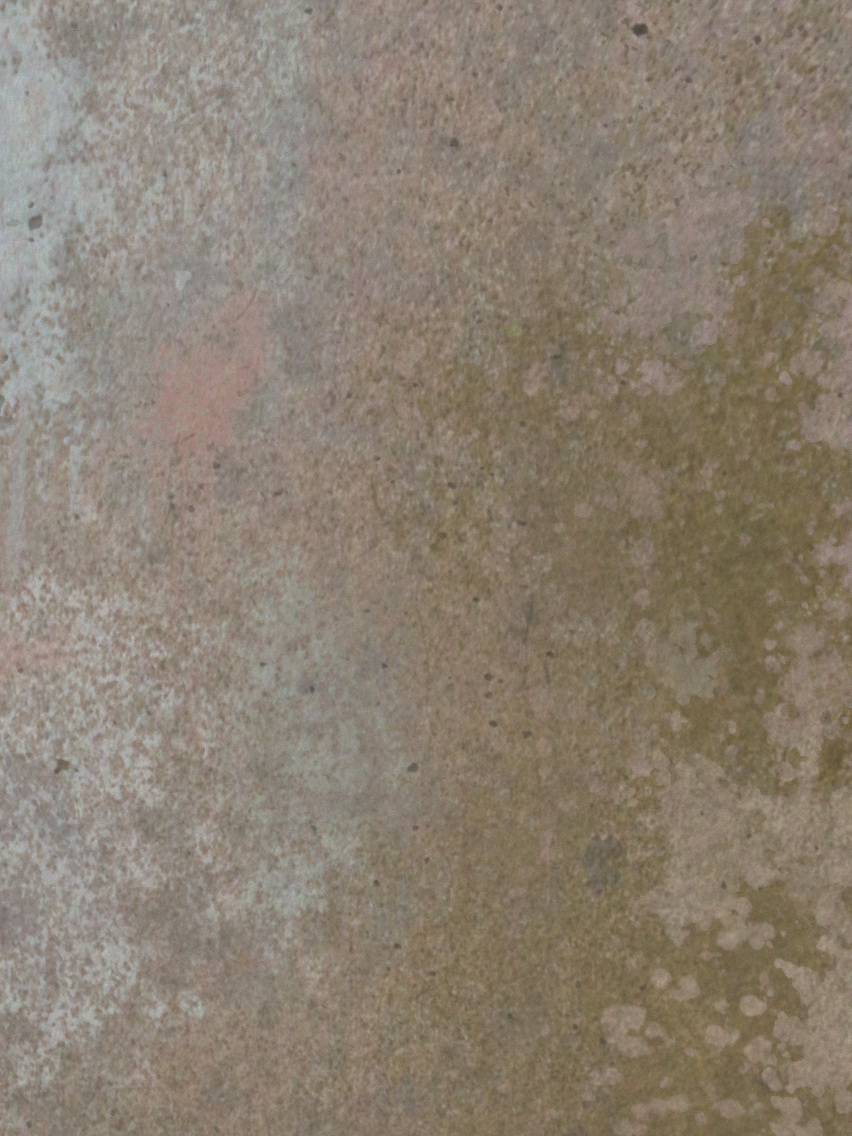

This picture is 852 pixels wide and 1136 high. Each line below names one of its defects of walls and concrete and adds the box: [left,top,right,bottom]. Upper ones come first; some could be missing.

water stain [576,824,626,897]